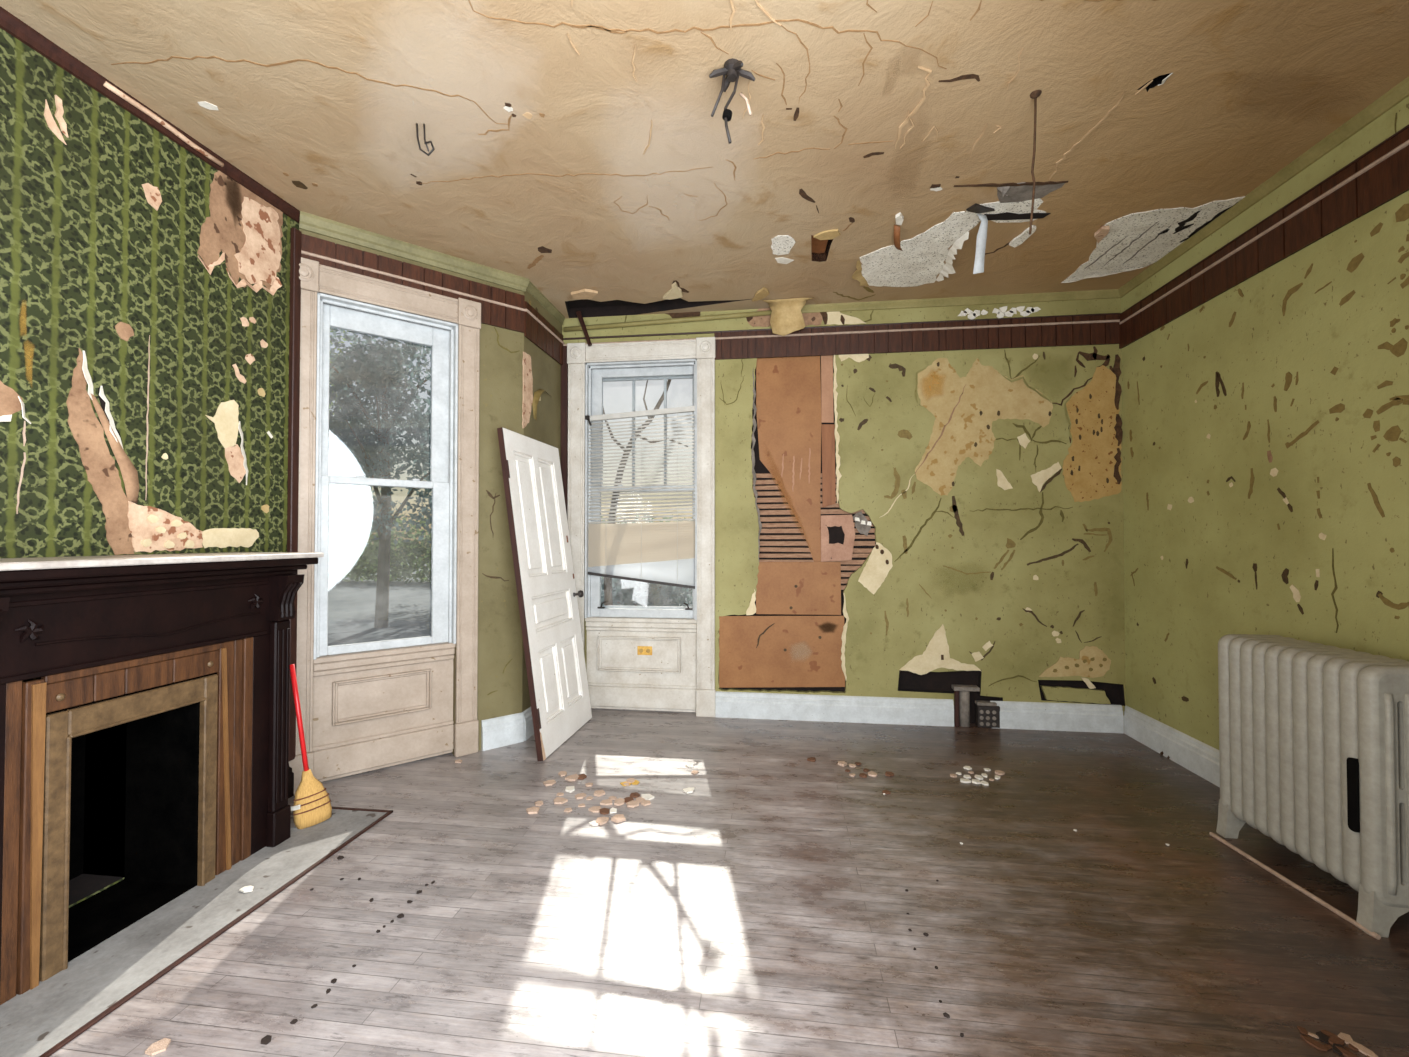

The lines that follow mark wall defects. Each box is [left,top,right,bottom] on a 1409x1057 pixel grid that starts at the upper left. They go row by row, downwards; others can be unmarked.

crack [111,56,512,135]
crack [468,0,980,159]
crack [799,189,815,203]
flaking render [860,211,981,287]
flaking render [1061,196,1245,283]
crack [1282,283,1303,316]
crack [879,349,1110,562]
peeling [869,354,1140,551]
spalling [127,501,259,553]
flaking render [751,354,908,680]
peeling [900,609,995,675]
crack [1022,608,1102,643]